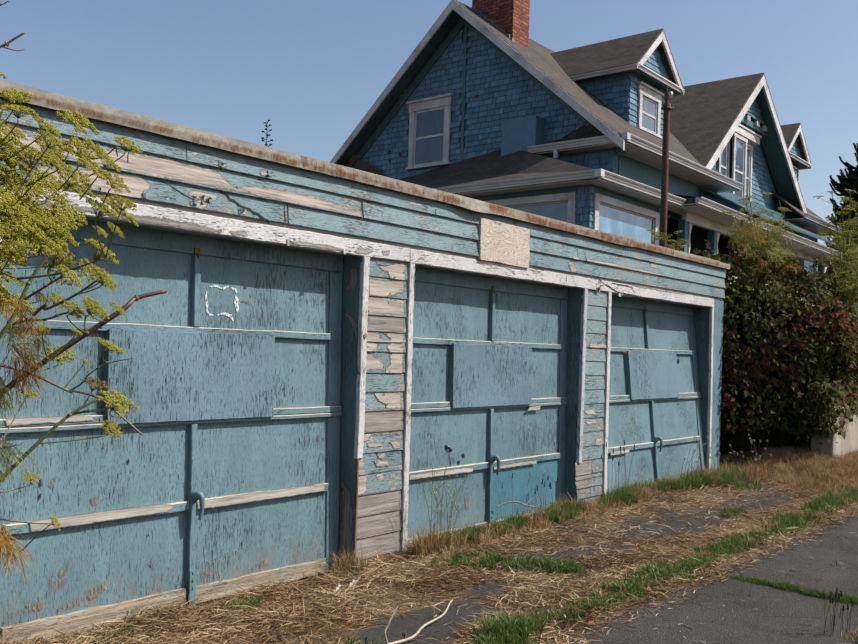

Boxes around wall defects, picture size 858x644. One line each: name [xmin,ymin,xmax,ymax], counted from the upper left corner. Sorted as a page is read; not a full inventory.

peeling [1,119,362,219]
peeling [31,200,248,236]
corrosion [527,213,673,256]
peeling [575,460,592,494]